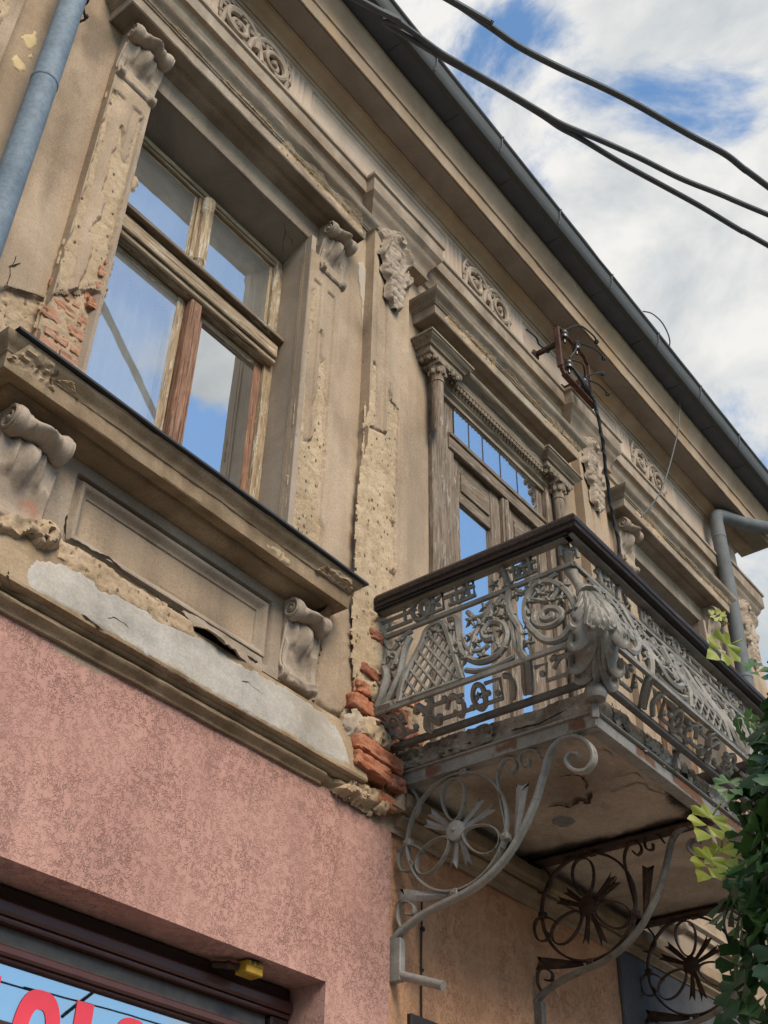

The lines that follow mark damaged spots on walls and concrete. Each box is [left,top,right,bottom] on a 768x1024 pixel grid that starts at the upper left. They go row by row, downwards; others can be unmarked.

flaking render [0,91,140,399]
flaking render [285,362,325,546]
flaking render [0,499,195,638]
flaking render [267,545,291,568]
flaking render [315,365,424,817]
crack [549,775,593,808]